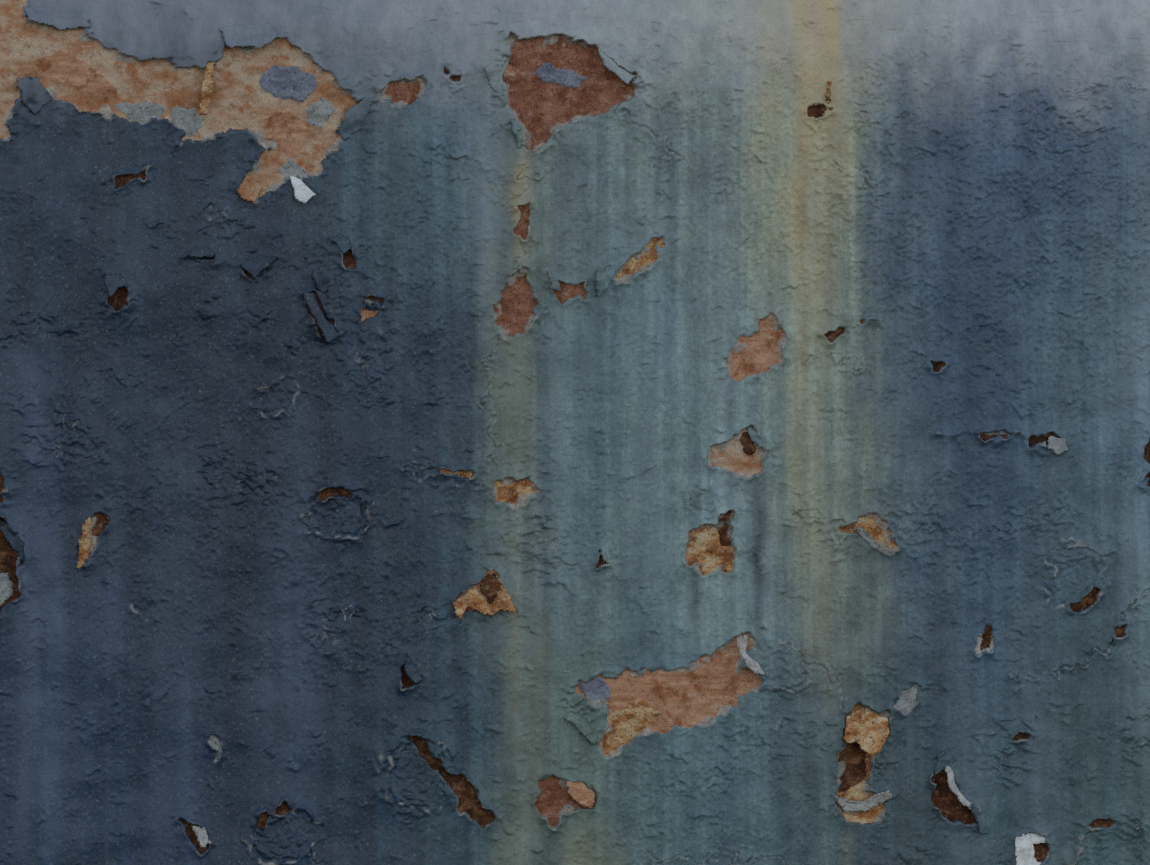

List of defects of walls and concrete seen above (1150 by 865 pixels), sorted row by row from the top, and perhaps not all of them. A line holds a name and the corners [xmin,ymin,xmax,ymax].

peeling [0,0,654,215]
peeling [484,196,672,348]
peeling [707,304,795,390]
peeling [699,420,780,489]
peeling [675,504,742,582]
peeling [444,564,517,622]
peeling [559,622,775,769]
peeling [397,726,502,839]
peeling [529,768,606,841]
peeling [827,677,925,833]
peeling [925,747,995,834]
peeling [1008,822,1055,865]